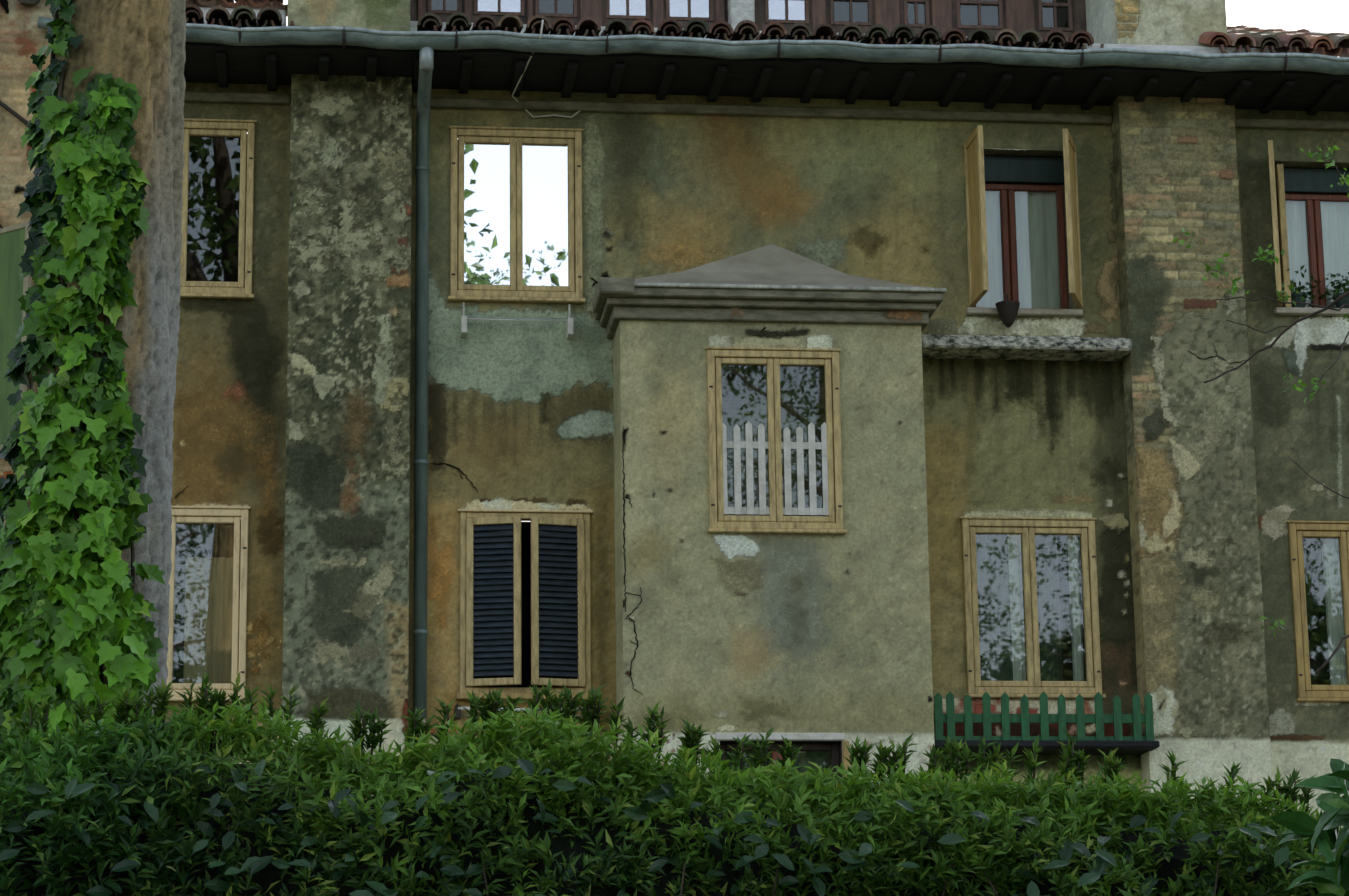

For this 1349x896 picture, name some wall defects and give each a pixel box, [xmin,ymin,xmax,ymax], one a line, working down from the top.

damp [929,358,1125,499]
spalling [928,96,1244,738]
peeling [1265,316,1349,376]
damp [286,442,399,664]
crack [622,428,643,695]
peeling [712,533,841,596]
damp [1098,521,1137,688]